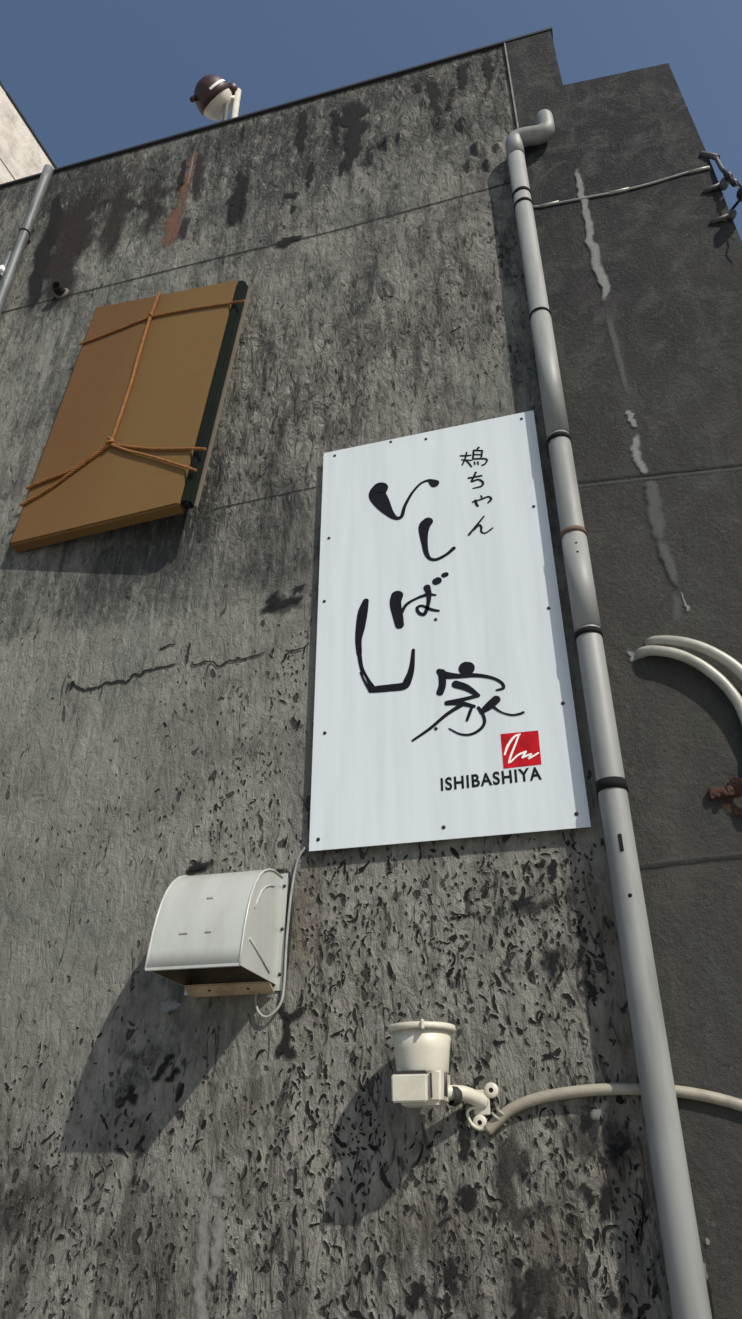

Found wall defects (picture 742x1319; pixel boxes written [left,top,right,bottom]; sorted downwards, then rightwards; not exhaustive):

corrosion [163,151,197,245]
leakage [575,171,610,299]
leakage [38,323,69,398]
leakage [607,319,628,390]
leakage [625,410,690,621]
crack [69,643,308,692]